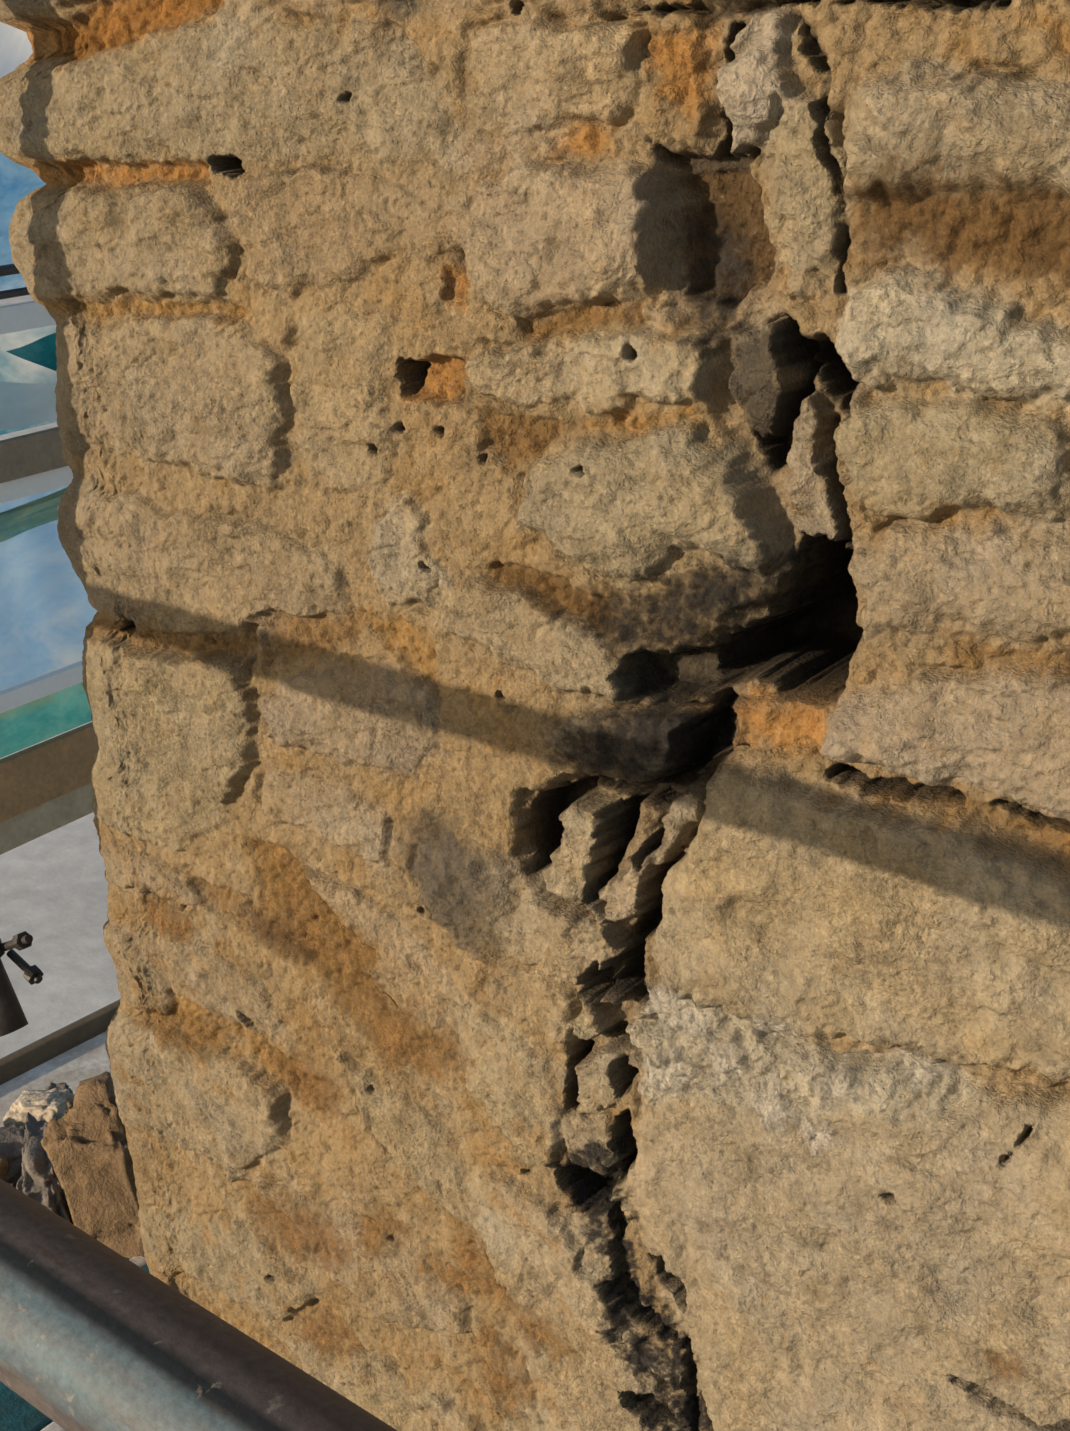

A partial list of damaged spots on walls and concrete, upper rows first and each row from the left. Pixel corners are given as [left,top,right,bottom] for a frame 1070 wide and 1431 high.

crack [613,0,988,178]
crack [519,310,864,1428]
leakage [557,1135,712,1431]